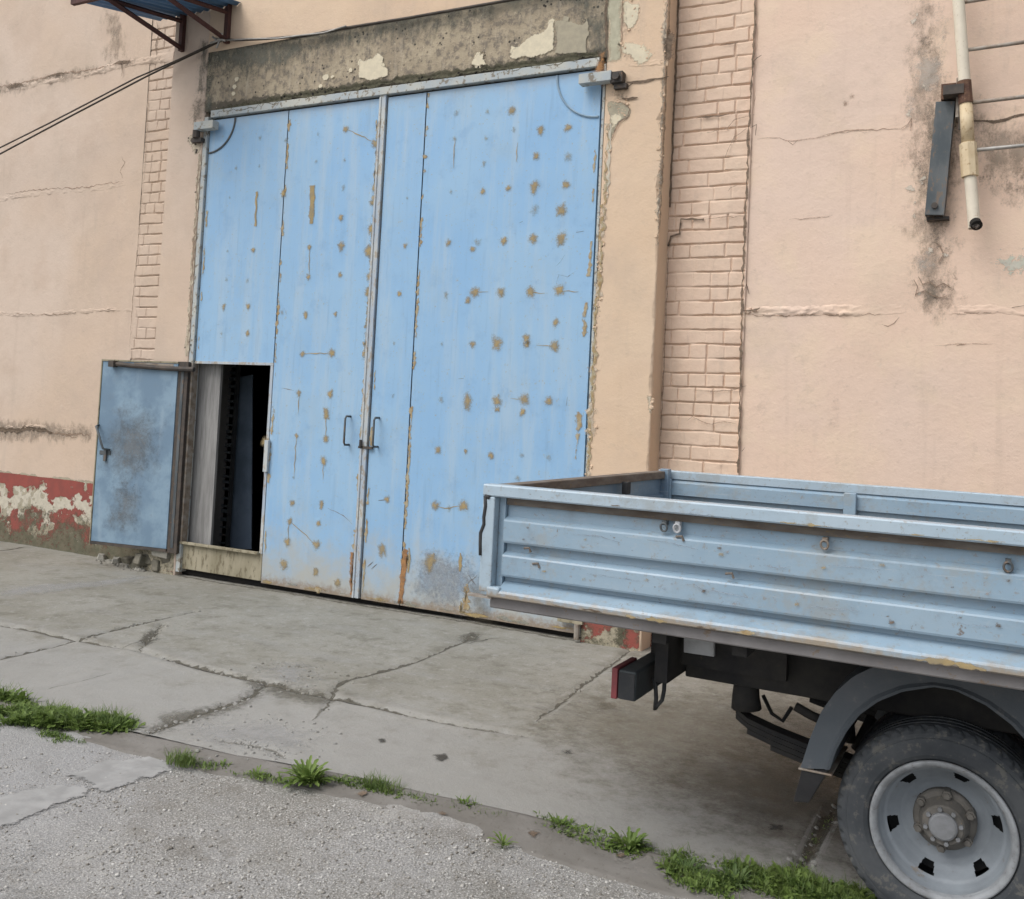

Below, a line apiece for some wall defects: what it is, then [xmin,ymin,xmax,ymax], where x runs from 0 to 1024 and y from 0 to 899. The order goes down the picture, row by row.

peeling [348,53,390,80]
peeling [471,51,486,68]
peeling [509,16,589,59]
peeling [604,0,675,238]
crack [826,127,890,135]
damp [901,41,951,307]
crack [621,0,761,473]
crack [0,422,90,440]
peeling [0,471,174,575]
crack [0,611,630,760]